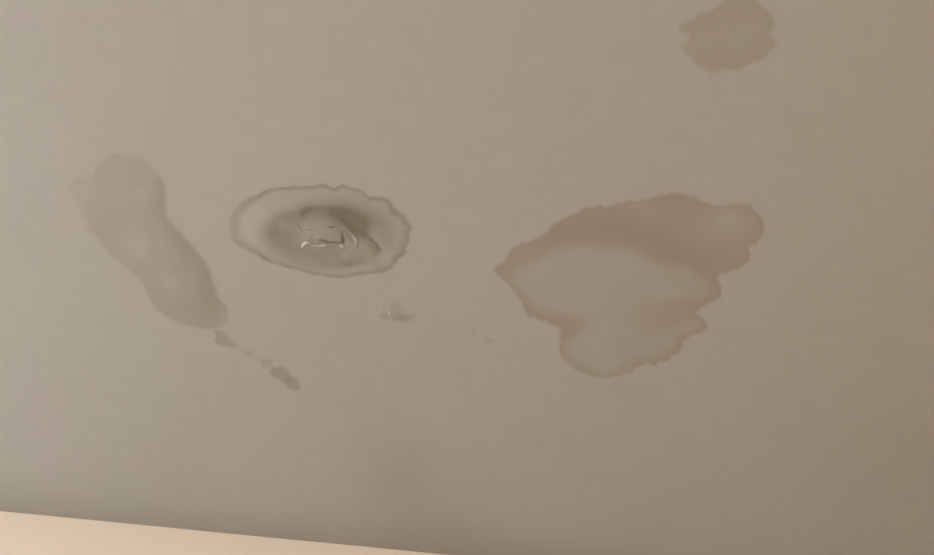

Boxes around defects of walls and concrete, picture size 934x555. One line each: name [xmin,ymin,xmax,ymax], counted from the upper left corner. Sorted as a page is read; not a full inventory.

water stain [676,0,779,77]
water stain [67,151,302,392]
water stain [492,191,767,381]